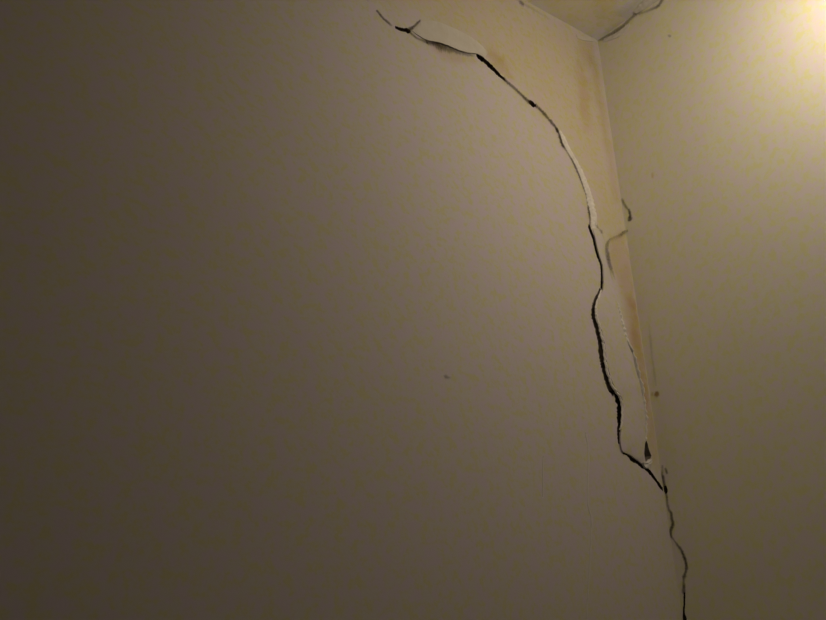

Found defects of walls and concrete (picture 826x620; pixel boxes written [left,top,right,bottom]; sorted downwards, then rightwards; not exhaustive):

crack [380,14,447,49]
flaking render [412,21,488,58]
crack [476,54,687,620]
flaking render [592,228,652,469]